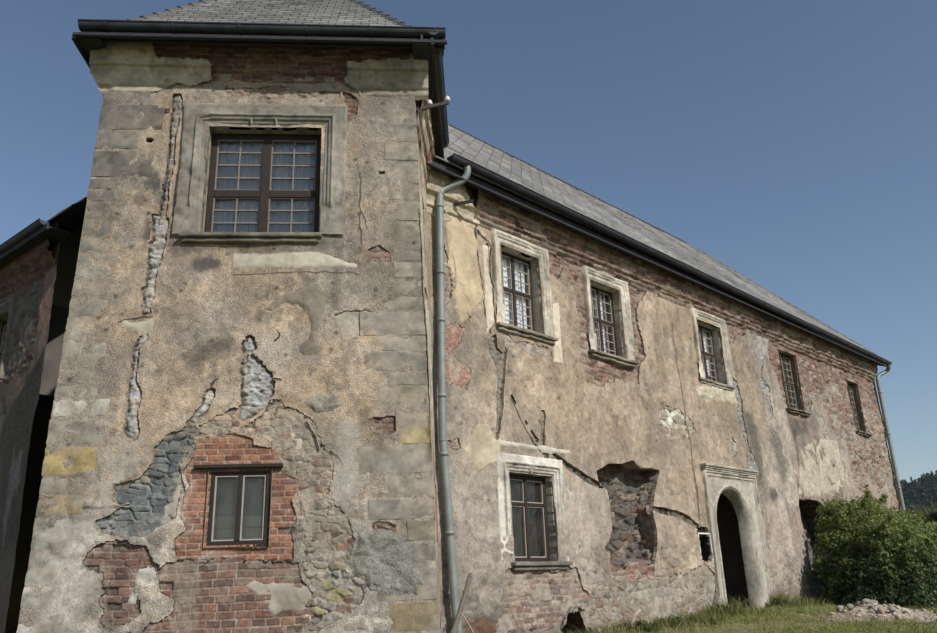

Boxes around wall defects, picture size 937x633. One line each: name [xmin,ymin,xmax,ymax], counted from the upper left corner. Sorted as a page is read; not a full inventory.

spalling [240,336,282,421]
peeling [444,217,493,388]
crack [474,226,602,488]
crack [733,380,758,471]
flaking render [83,420,322,633]
flaking render [496,567,604,633]